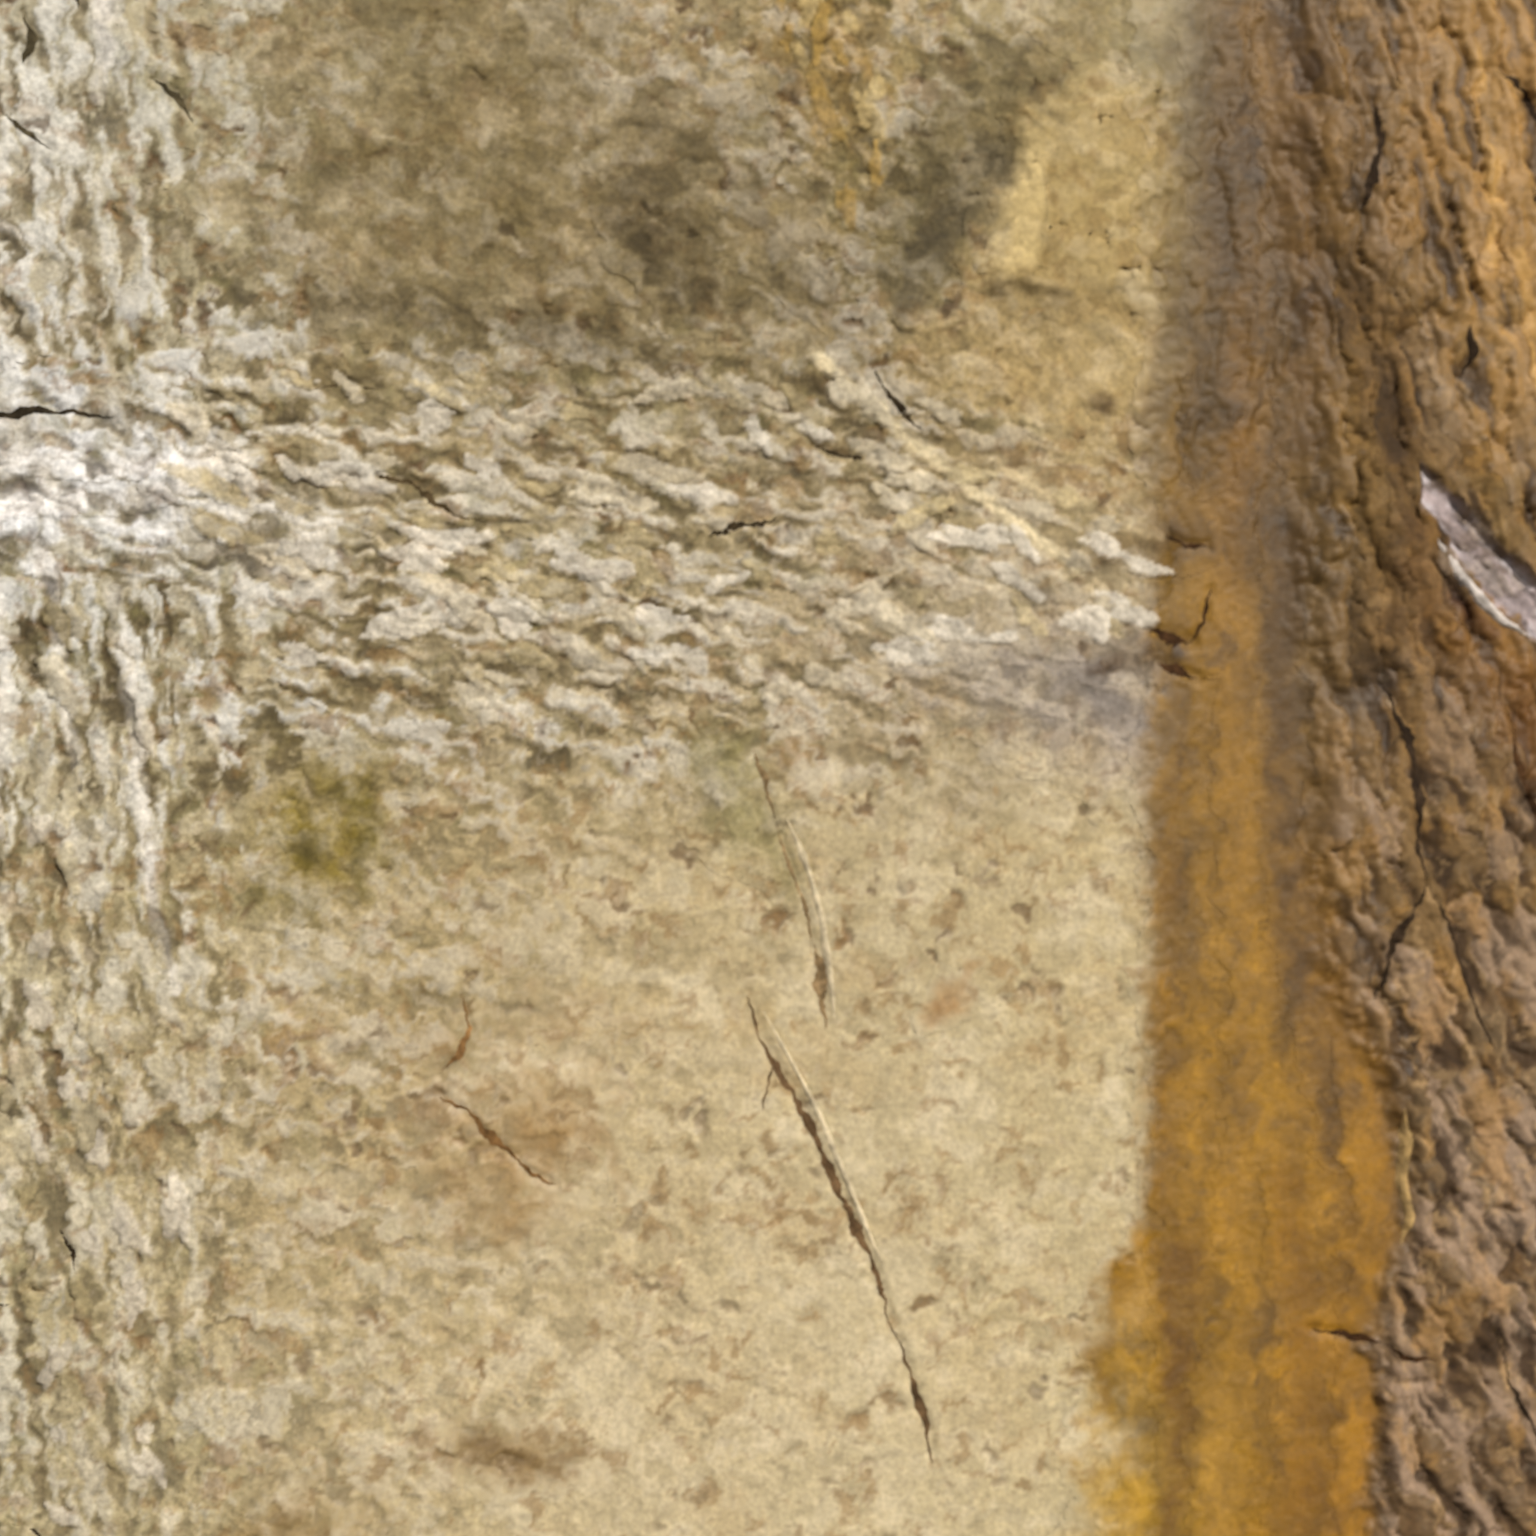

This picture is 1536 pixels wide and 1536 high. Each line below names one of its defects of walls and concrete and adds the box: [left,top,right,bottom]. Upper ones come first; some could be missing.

spalling [1416,458,1536,644]
rust [1031,0,1536,1536]
crack [1512,708,1536,820]
crack [753,750,835,1028]
crack [1374,676,1495,1049]
rust [909,956,987,1039]
crack [747,996,933,1463]
crack [1313,1328,1435,1363]
crack [1495,1331,1536,1434]